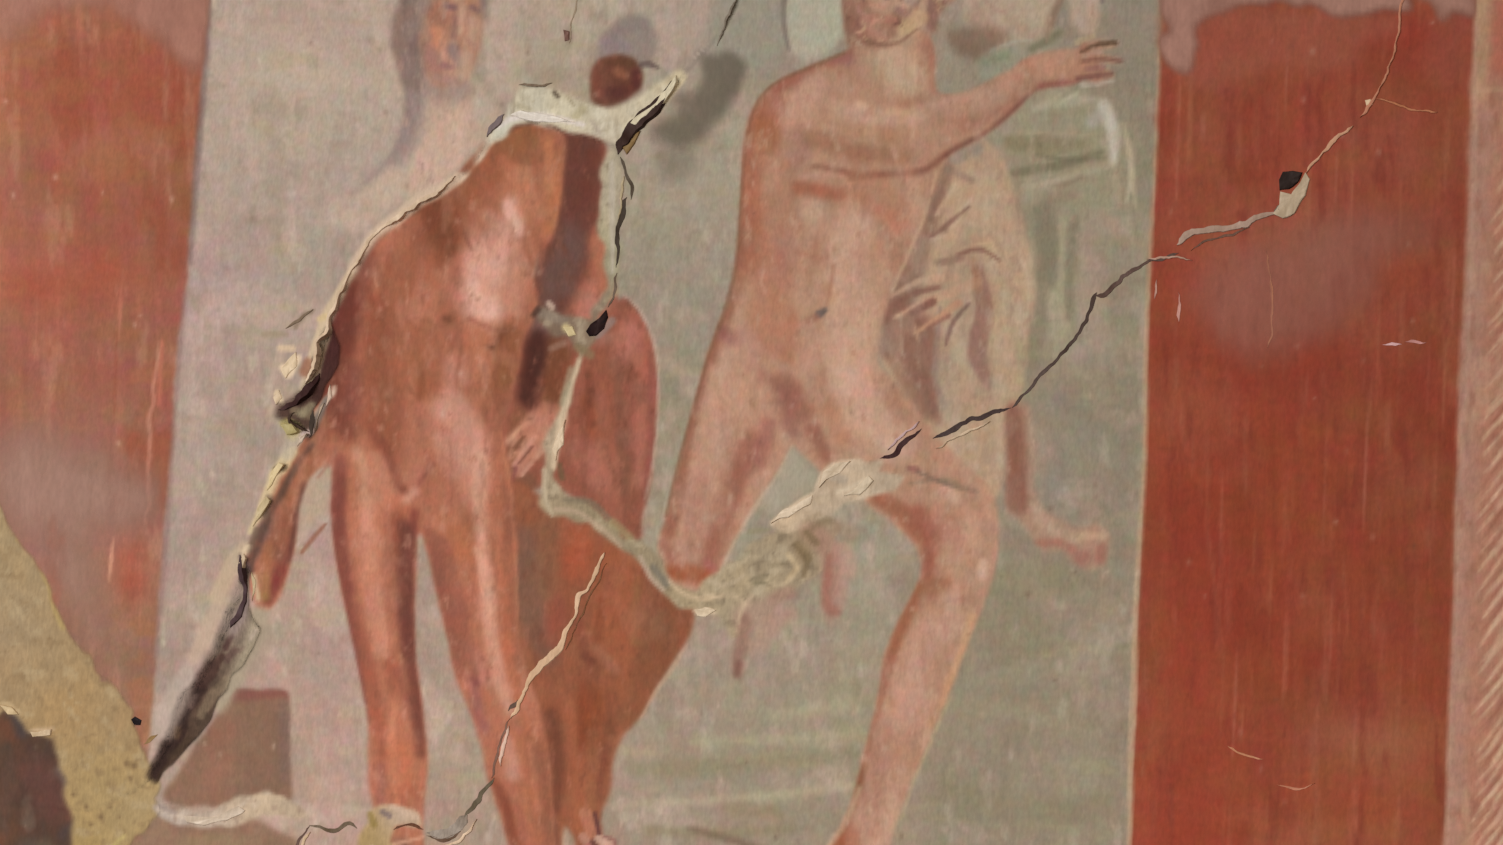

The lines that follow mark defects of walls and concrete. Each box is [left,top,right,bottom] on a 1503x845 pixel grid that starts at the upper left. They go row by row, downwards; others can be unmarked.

crack [563,0,578,43]
crack [717,0,737,46]
crack [149,176,455,781]
crack [586,81,671,336]
spalling [460,67,906,637]
crack [881,0,1437,459]
spalling [0,504,307,845]
crack [296,821,357,845]
crack [395,552,607,845]